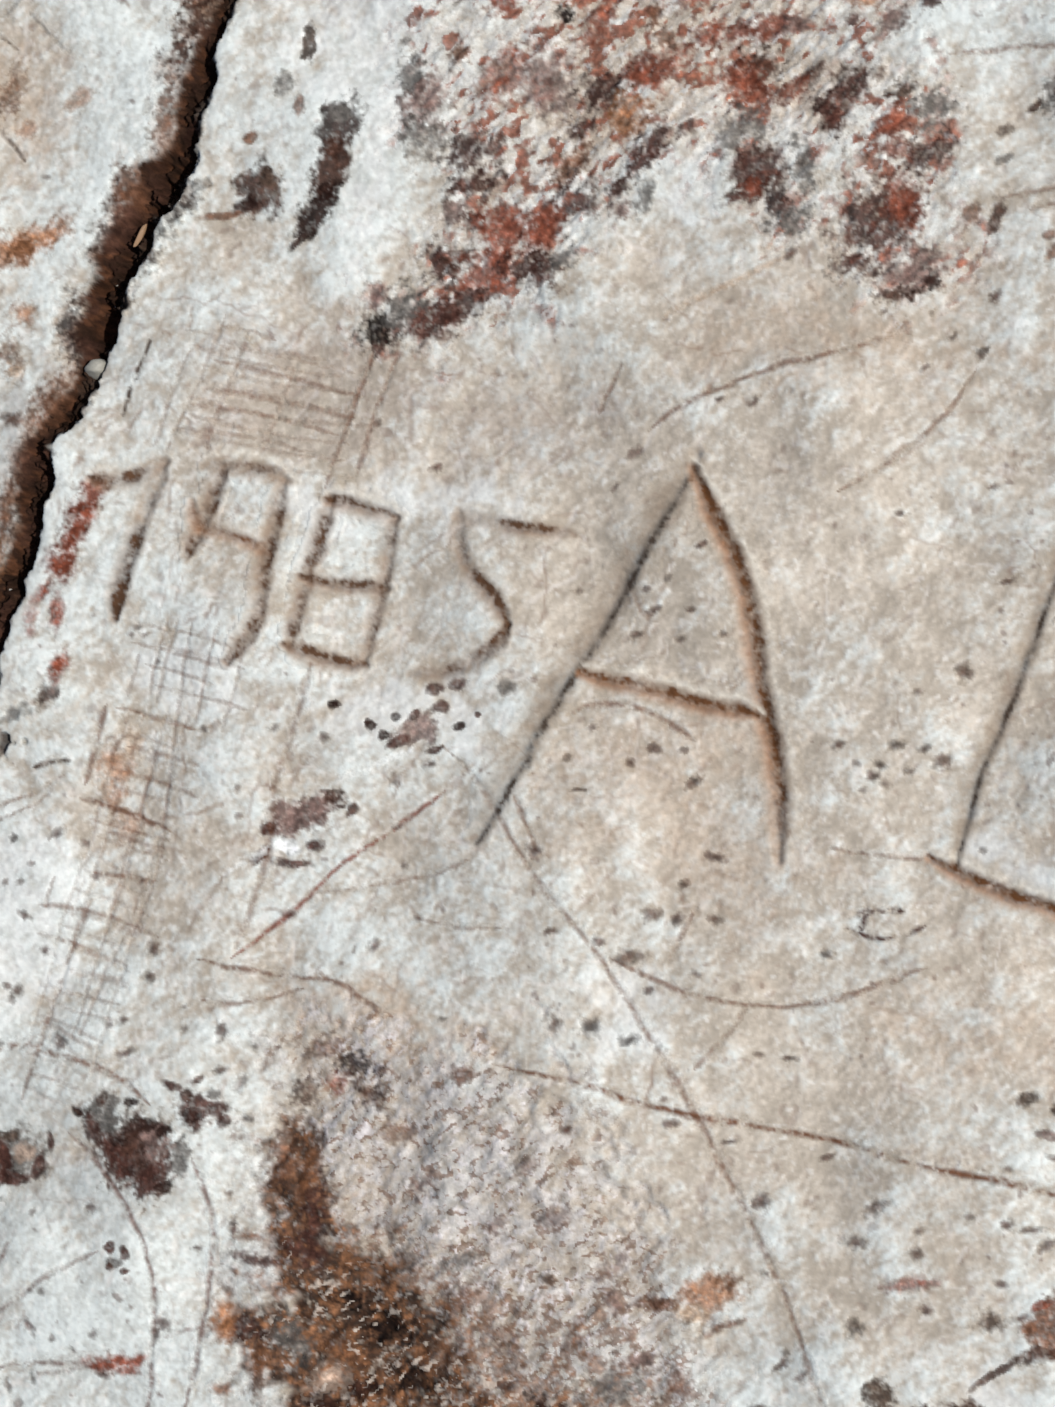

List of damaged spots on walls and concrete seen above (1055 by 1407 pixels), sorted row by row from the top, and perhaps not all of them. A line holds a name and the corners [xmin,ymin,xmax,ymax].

crack [0,0,254,761]